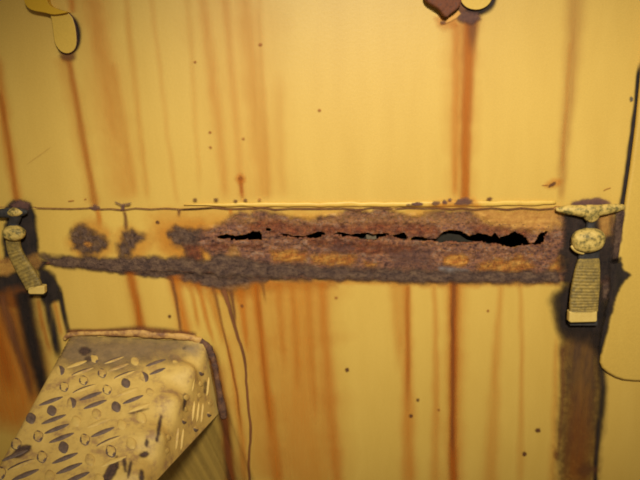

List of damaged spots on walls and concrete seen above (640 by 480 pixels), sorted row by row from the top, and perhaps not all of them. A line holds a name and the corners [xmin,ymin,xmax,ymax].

rust [571,197,611,205]
rust [620,68,640,205]
rust [0,200,630,480]